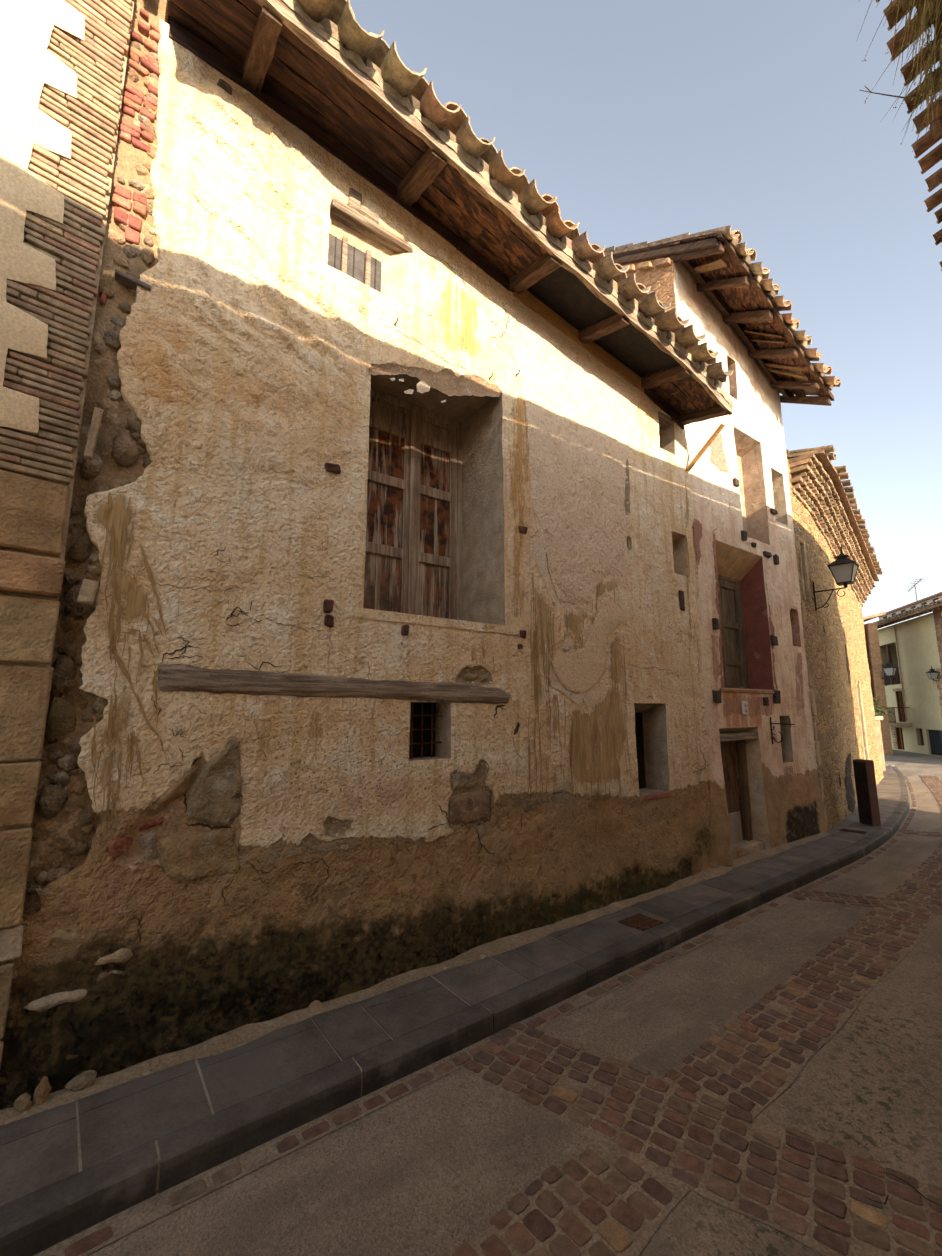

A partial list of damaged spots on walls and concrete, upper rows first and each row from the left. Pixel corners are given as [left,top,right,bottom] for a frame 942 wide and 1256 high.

spalling [368,362,503,403]
spalling [23,0,167,915]
damp [91,493,167,841]
crack [156,547,335,665]
damp [504,397,632,854]
spalling [108,736,242,882]
spalling [301,816,361,851]
spalling [448,759,495,844]
damp [0,827,711,1109]